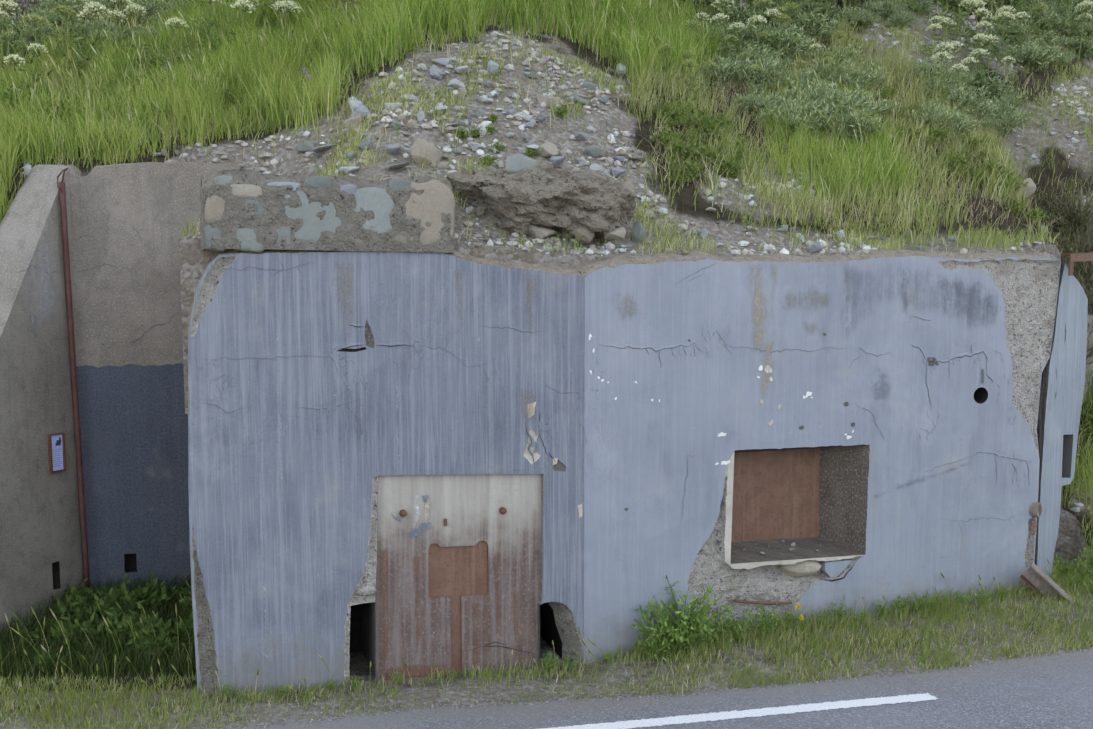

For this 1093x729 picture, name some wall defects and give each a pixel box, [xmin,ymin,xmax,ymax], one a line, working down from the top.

crack [199,319,484,413]
crack [525,412,556,463]
peeling [523,402,576,473]
crack [600,331,993,434]
crack [923,265,1066,501]
spalling [938,258,1061,457]
spalling [344,476,378,685]
spalling [687,460,864,632]